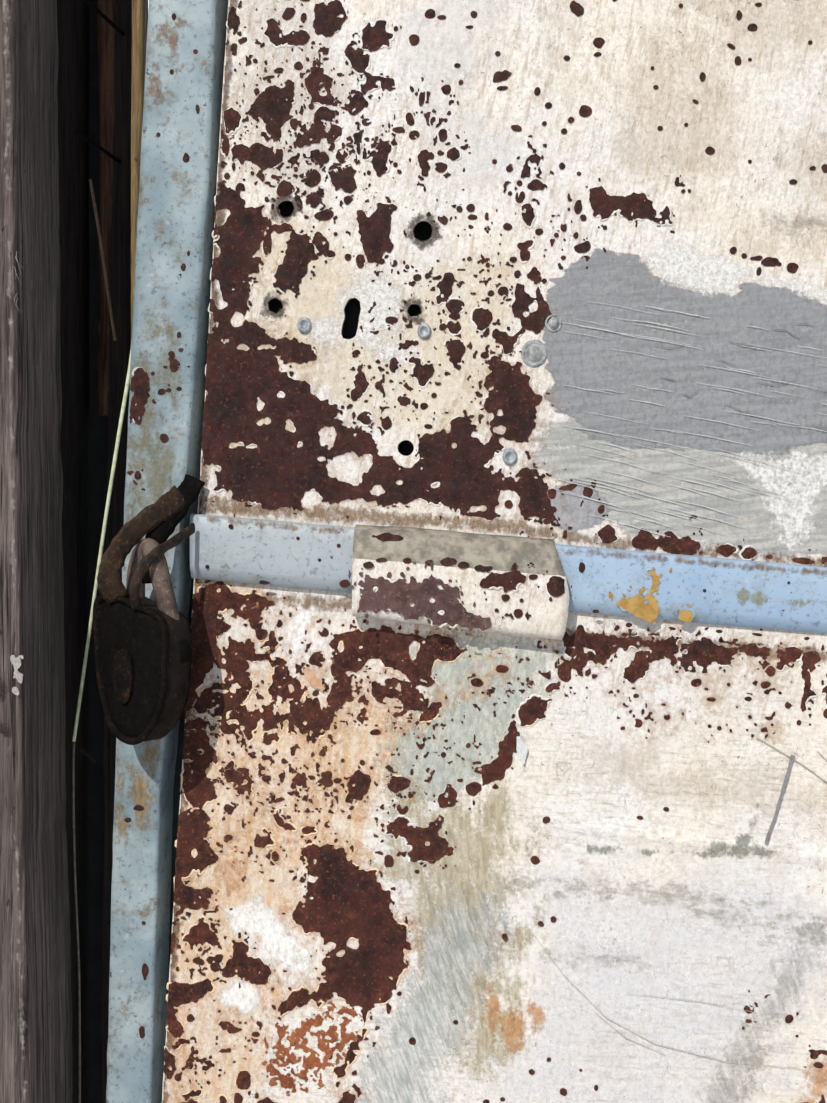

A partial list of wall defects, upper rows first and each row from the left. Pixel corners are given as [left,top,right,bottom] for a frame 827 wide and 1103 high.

rust [148,66,174,98]
rust [159,13,184,51]
rust [201,0,827,567]
rust [127,326,190,519]
rust [164,557,827,1103]